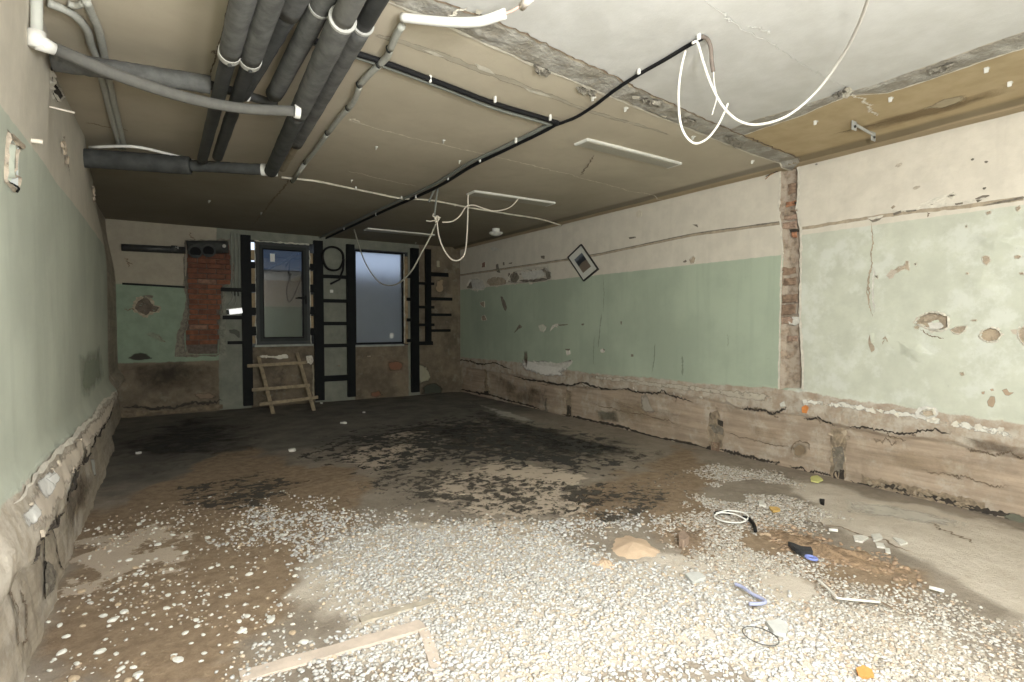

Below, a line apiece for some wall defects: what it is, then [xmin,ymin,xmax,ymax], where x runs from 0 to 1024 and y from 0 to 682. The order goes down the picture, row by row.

spalling [4,131,26,192]
flaking render [183,238,234,358]
crack [866,223,888,352]
flaking render [777,166,1024,437]
peeling [28,399,114,538]
crack [9,399,221,650]
leakage [297,406,671,527]
crack [460,359,1024,542]